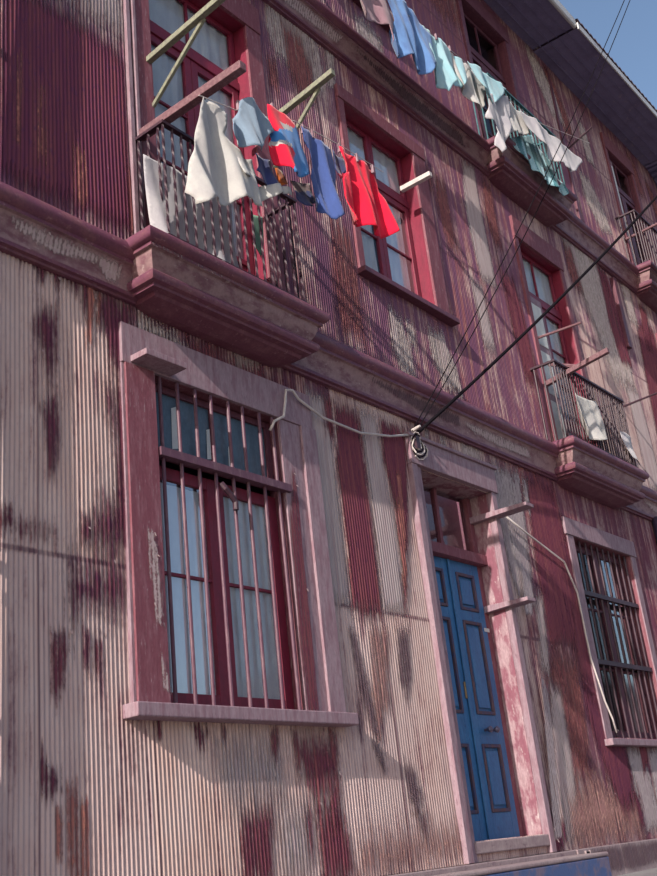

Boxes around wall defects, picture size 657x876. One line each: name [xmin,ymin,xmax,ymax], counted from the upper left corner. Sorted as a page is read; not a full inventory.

corrosion [322,394,388,739]
corrosion [526,474,646,849]
corrosion [639,747,648,776]
corrosion [56,777,89,876]
corrosion [239,798,276,876]